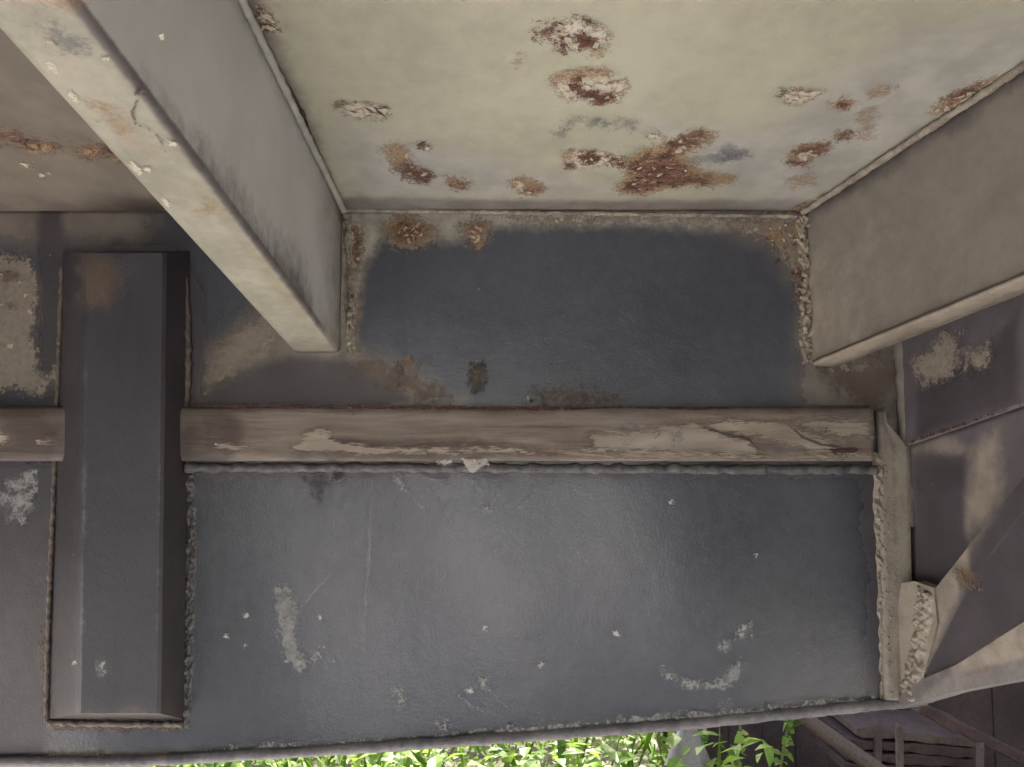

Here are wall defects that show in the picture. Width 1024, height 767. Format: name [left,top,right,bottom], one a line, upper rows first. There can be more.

crack [131,90,163,144]
rust [928,75,998,116]
rust [381,140,472,191]
rust [561,128,738,197]
rust [782,128,861,171]
rust [379,214,442,251]
peeling [0,249,56,398]
damp [206,315,279,391]
damp [465,360,488,394]
peeling [910,331,991,387]
peeling [290,429,536,473]
peeling [556,415,875,461]